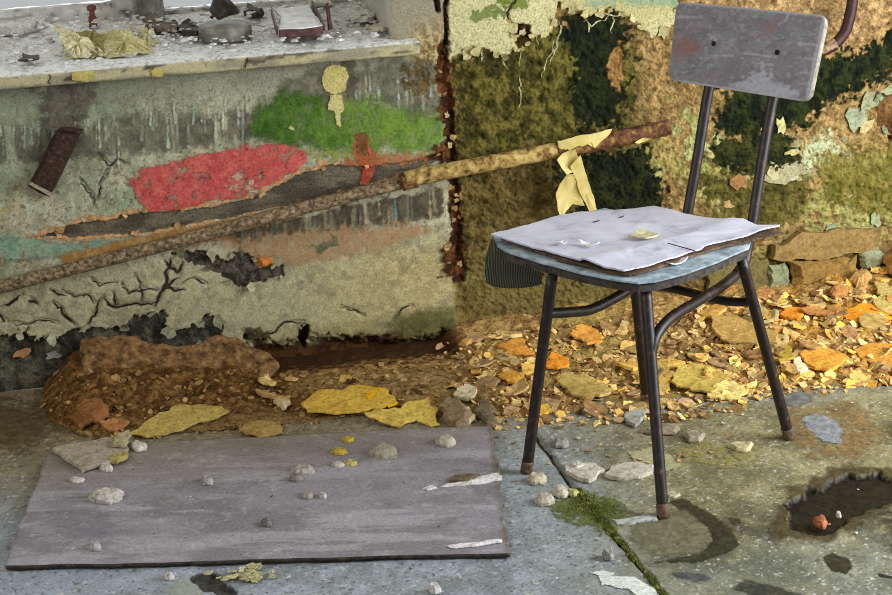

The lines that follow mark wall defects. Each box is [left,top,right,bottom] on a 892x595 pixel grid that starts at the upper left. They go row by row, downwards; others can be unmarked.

peeling [446,0,892,61]
water stain [0,121,58,164]
water stain [70,96,268,169]
peeling [556,129,612,215]
water stain [671,23,892,232]
peeling [764,149,818,185]
peeling [845,85,892,147]
crack [0,255,205,335]
flaking render [171,248,284,293]
flaking render [0,310,225,392]
crack [536,438,592,511]
spalling [768,464,892,543]